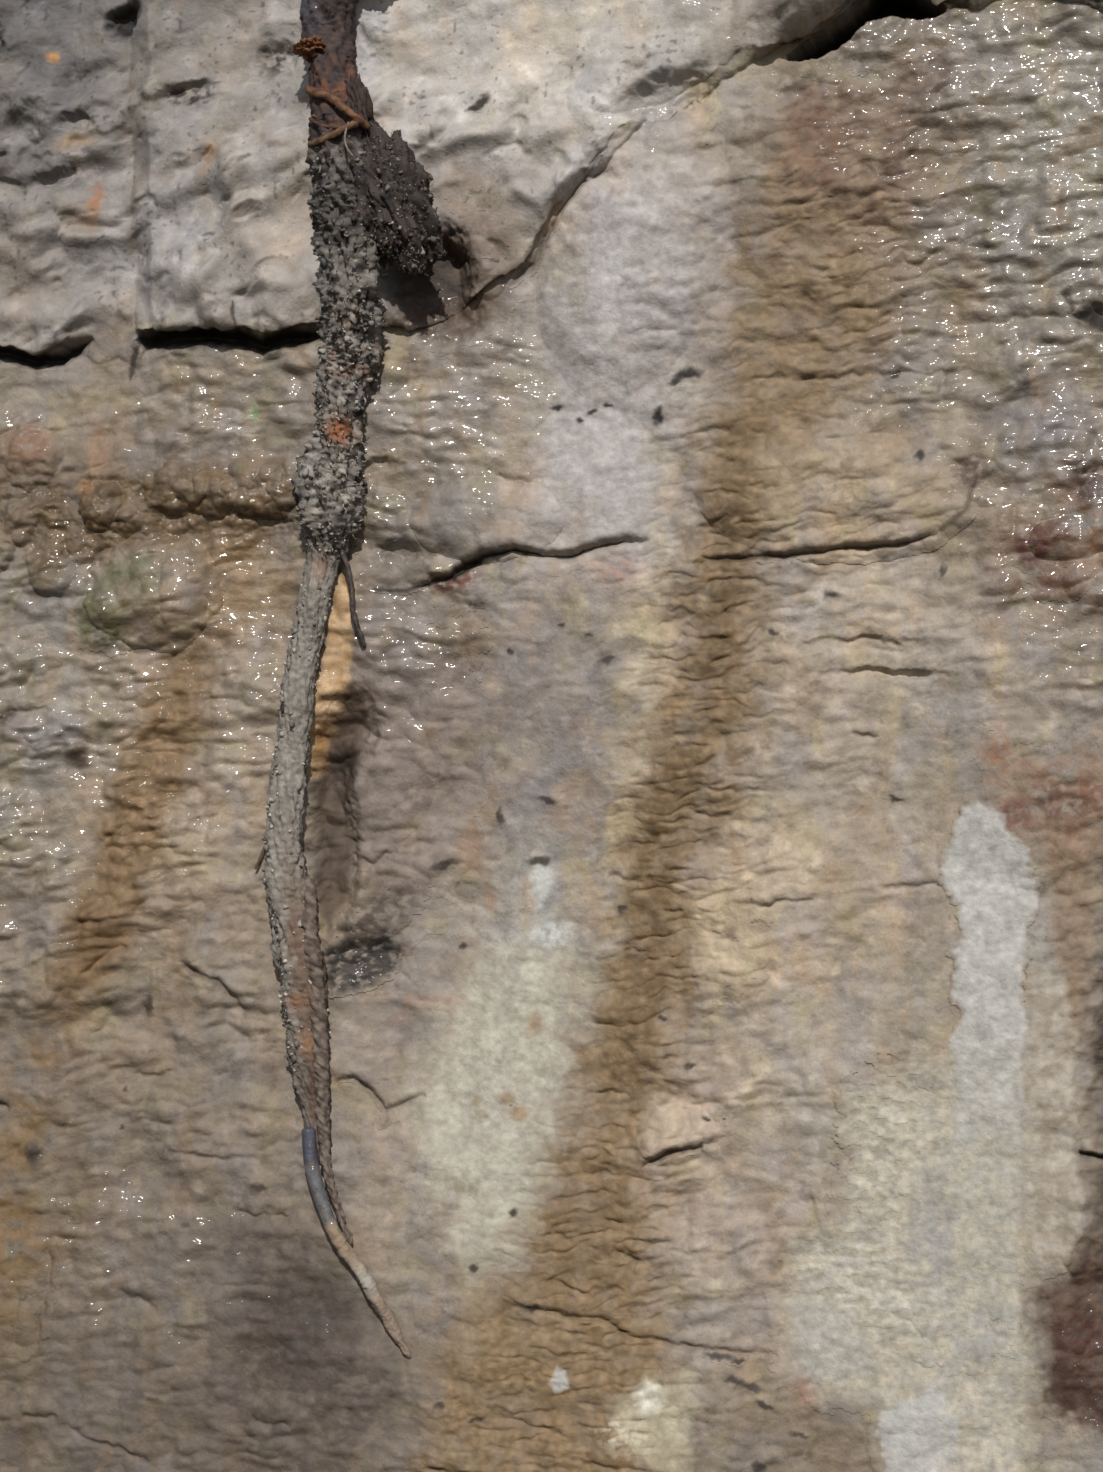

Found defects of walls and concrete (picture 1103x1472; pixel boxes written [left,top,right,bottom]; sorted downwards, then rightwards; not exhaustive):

crack [1081,0,1103,11]
water stain [151,83,216,107]
crack [507,146,613,289]
crack [0,336,95,375]
crack [127,299,323,382]
crack [371,559,488,595]
rust [423,567,488,599]
crack [531,539,649,559]
crack [702,550,794,565]
rust [255,0,447,1358]
water stain [169,16,994,1472]
water stain [762,799,1103,1472]